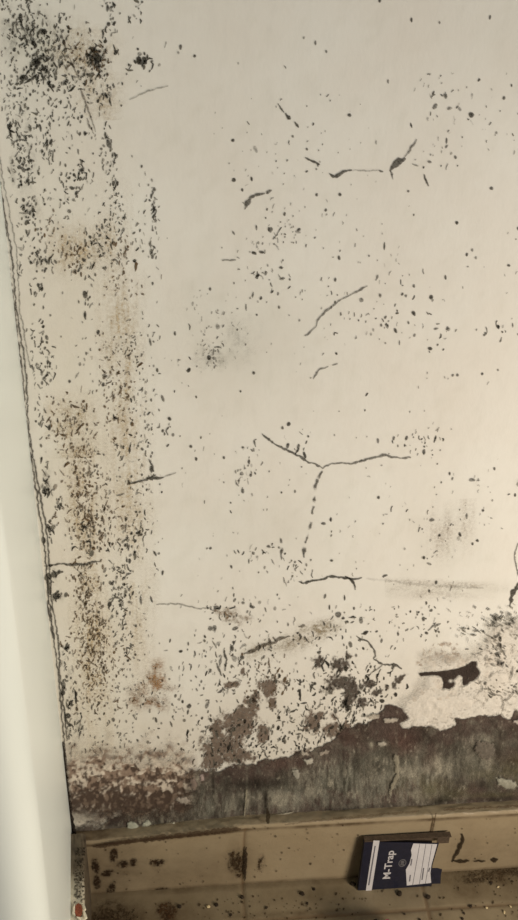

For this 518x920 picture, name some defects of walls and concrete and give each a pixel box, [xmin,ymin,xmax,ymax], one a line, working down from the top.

crack [305,157,352,178]
crack [380,140,429,186]
crack [305,275,378,336]
leakage [0,0,409,771]
crack [262,434,411,559]
crack [301,575,361,590]
crack [509,544,518,606]
leakage [389,581,518,673]
peeling [67,621,518,833]